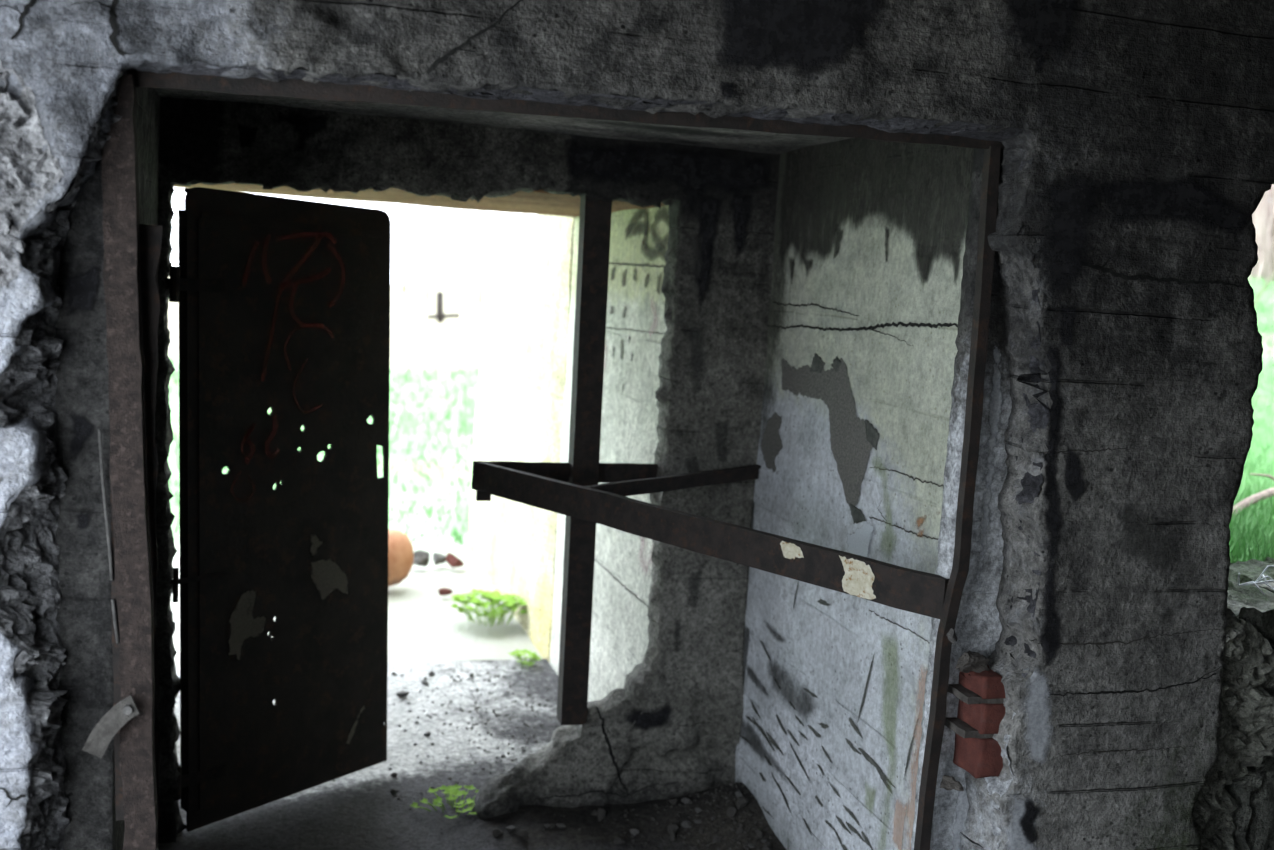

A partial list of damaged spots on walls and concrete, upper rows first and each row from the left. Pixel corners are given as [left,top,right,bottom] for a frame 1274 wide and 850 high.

crack [768,302,958,346]
spalling [0,60,1025,850]
spalling [1015,454,1045,530]
spalling [1015,393,1049,461]
spalling [1004,552,1041,678]
spalling [1192,608,1274,850]
crack [0,788,26,807]